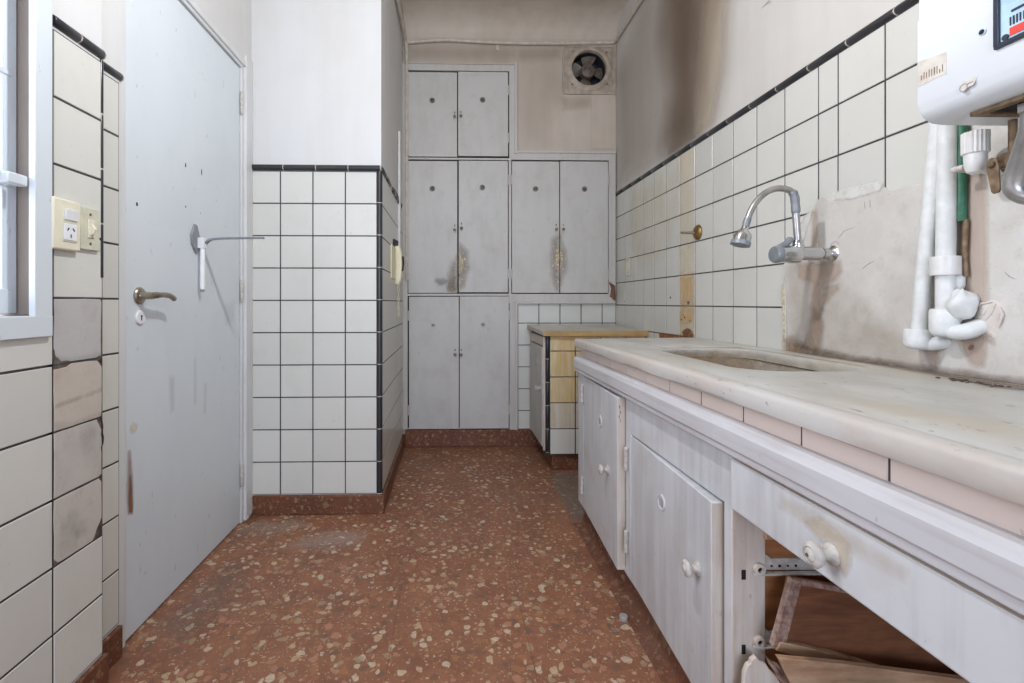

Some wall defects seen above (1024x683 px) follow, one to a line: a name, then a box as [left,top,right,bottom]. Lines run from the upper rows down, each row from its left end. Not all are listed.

peeling [969,125,1008,160]
peeling [781,174,1024,385]
crack [98,418,106,452]